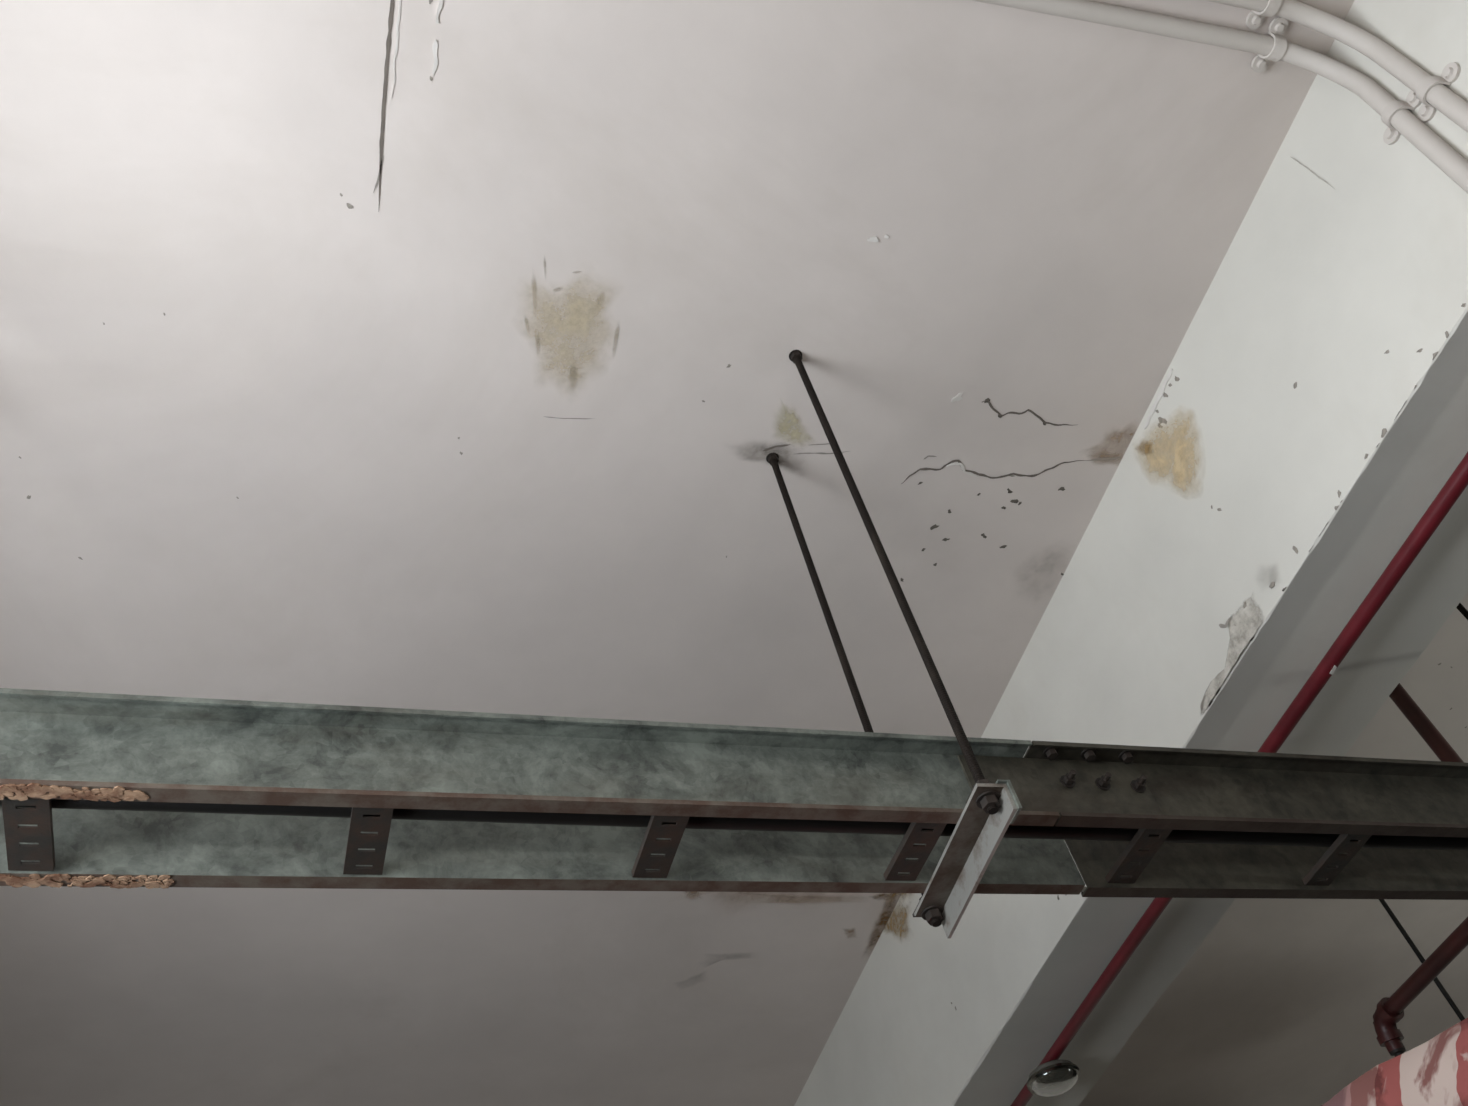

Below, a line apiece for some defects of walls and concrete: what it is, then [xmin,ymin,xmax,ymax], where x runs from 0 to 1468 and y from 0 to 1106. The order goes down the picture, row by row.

crack [373,0,401,212]
crack [903,393,1122,483]
spalling [1200,598,1262,712]